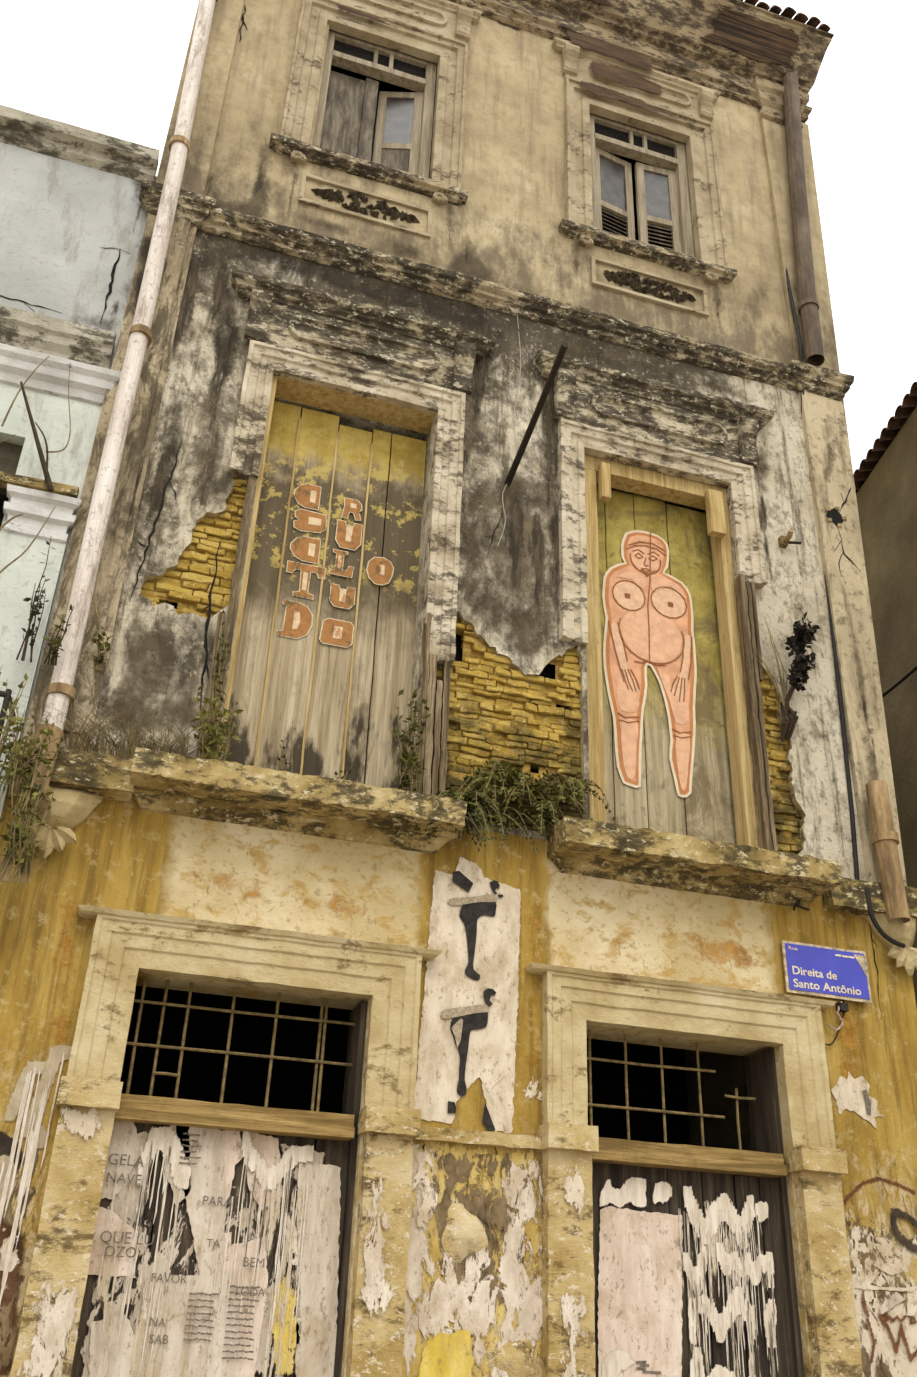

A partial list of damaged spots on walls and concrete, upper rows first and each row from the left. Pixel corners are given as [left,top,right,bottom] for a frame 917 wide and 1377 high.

leakage [130,404,180,543]
spalling [141,477,247,618]
leakage [173,236,560,656]
crack [834,487,861,576]
leakage [110,629,199,731]
spalling [436,616,583,833]
spalling [760,673,803,854]